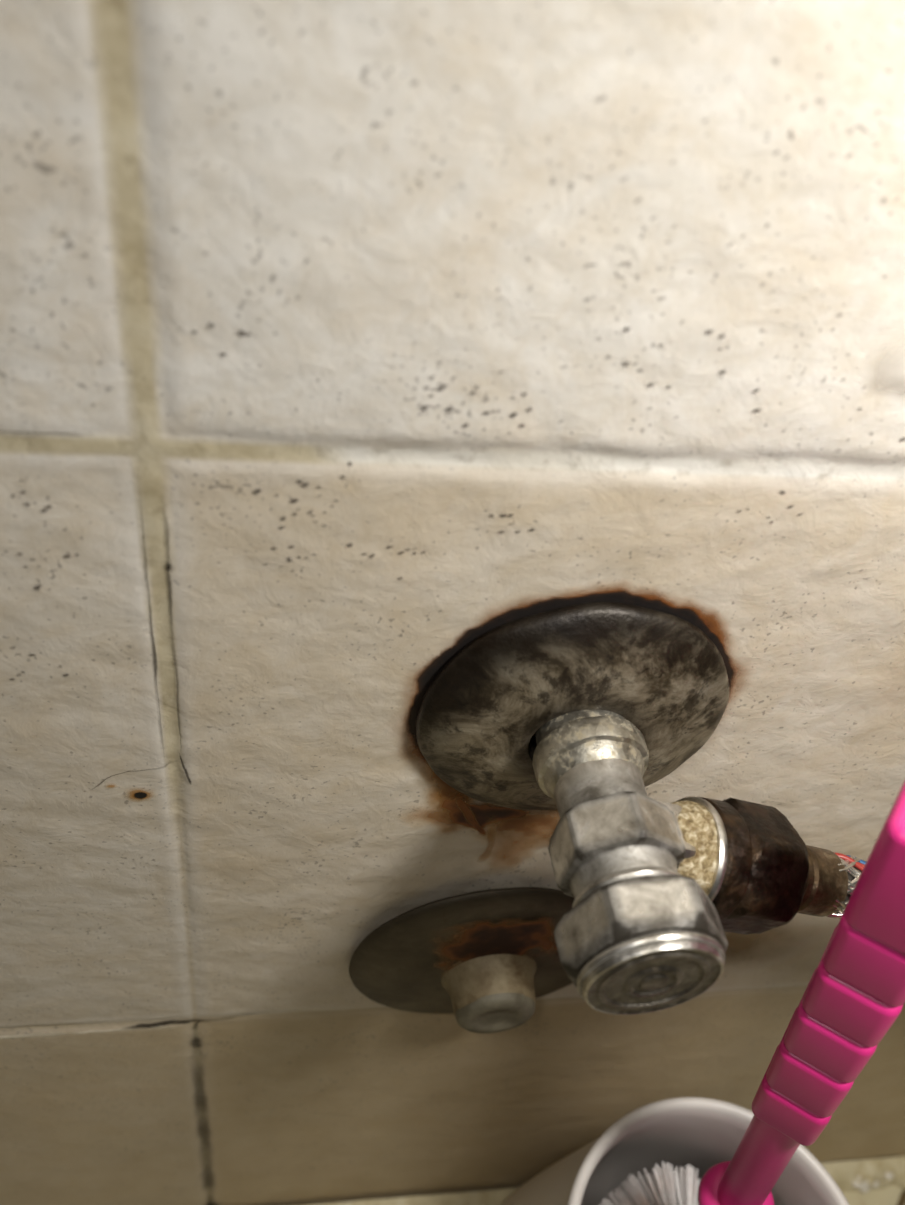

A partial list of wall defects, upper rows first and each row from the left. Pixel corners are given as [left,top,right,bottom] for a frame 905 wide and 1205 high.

corrosion [130,790,150,800]
crack [142,523,191,784]
corrosion [407,587,740,863]
corrosion [437,919,558,971]